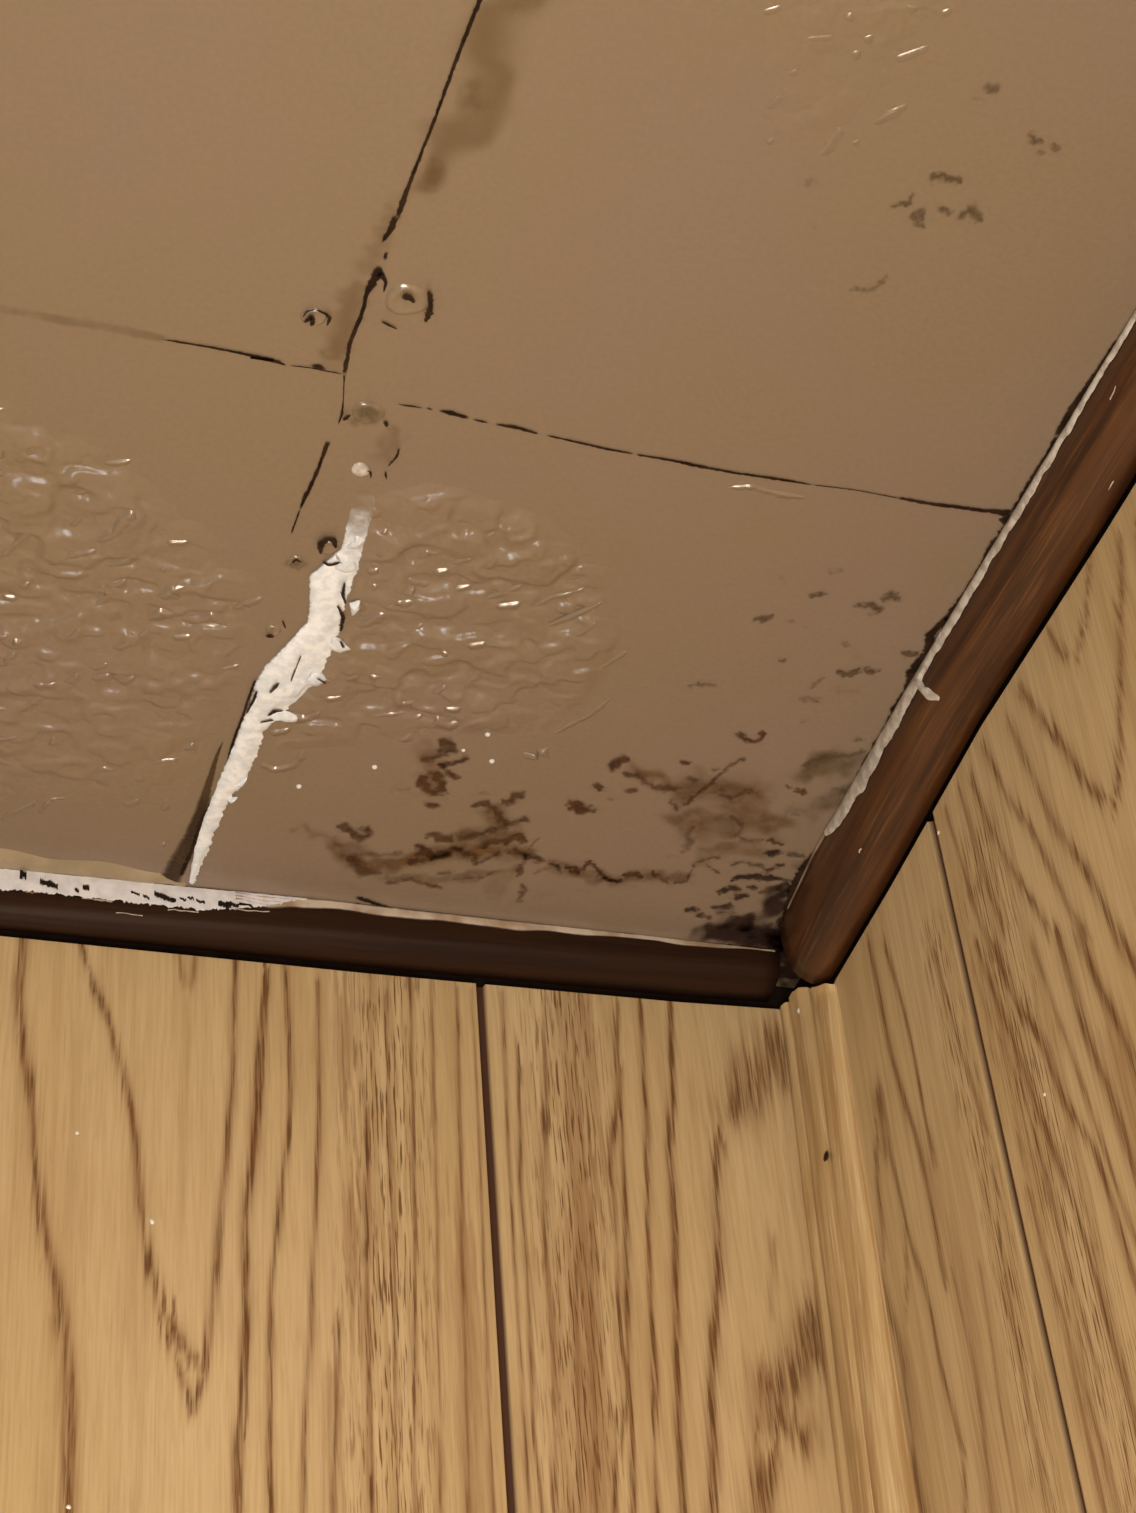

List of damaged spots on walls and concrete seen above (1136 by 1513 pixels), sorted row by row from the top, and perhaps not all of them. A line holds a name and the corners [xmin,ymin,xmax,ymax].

peeling [0,517,775,952]
damp [416,739,469,808]
damp [734,731,766,764]
damp [333,793,683,888]
damp [609,756,799,986]